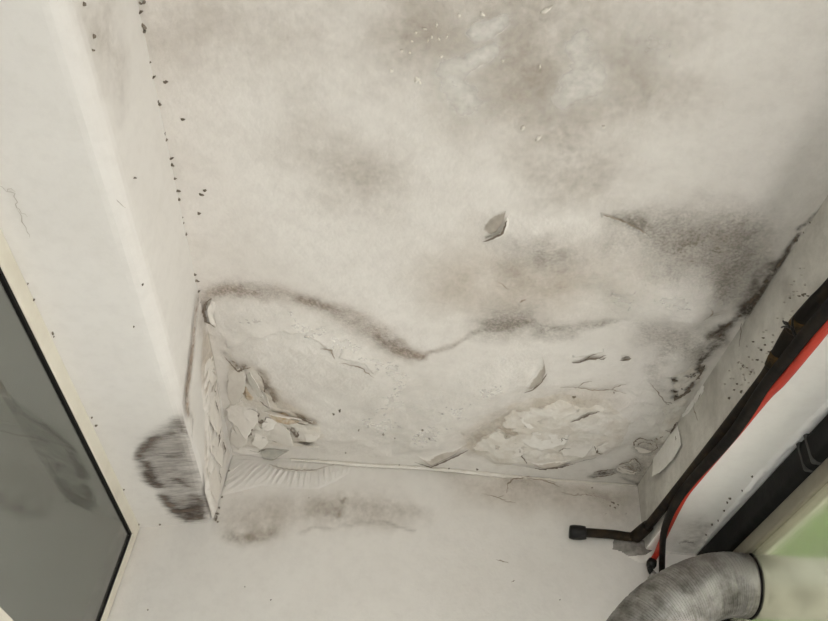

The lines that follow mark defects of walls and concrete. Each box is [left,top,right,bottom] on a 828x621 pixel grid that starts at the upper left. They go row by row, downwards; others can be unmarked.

peeling [483,211,509,242]
leakage [697,232,804,367]
leakage [136,432,204,520]
flaking render [201,351,351,523]
flaking render [415,356,709,477]